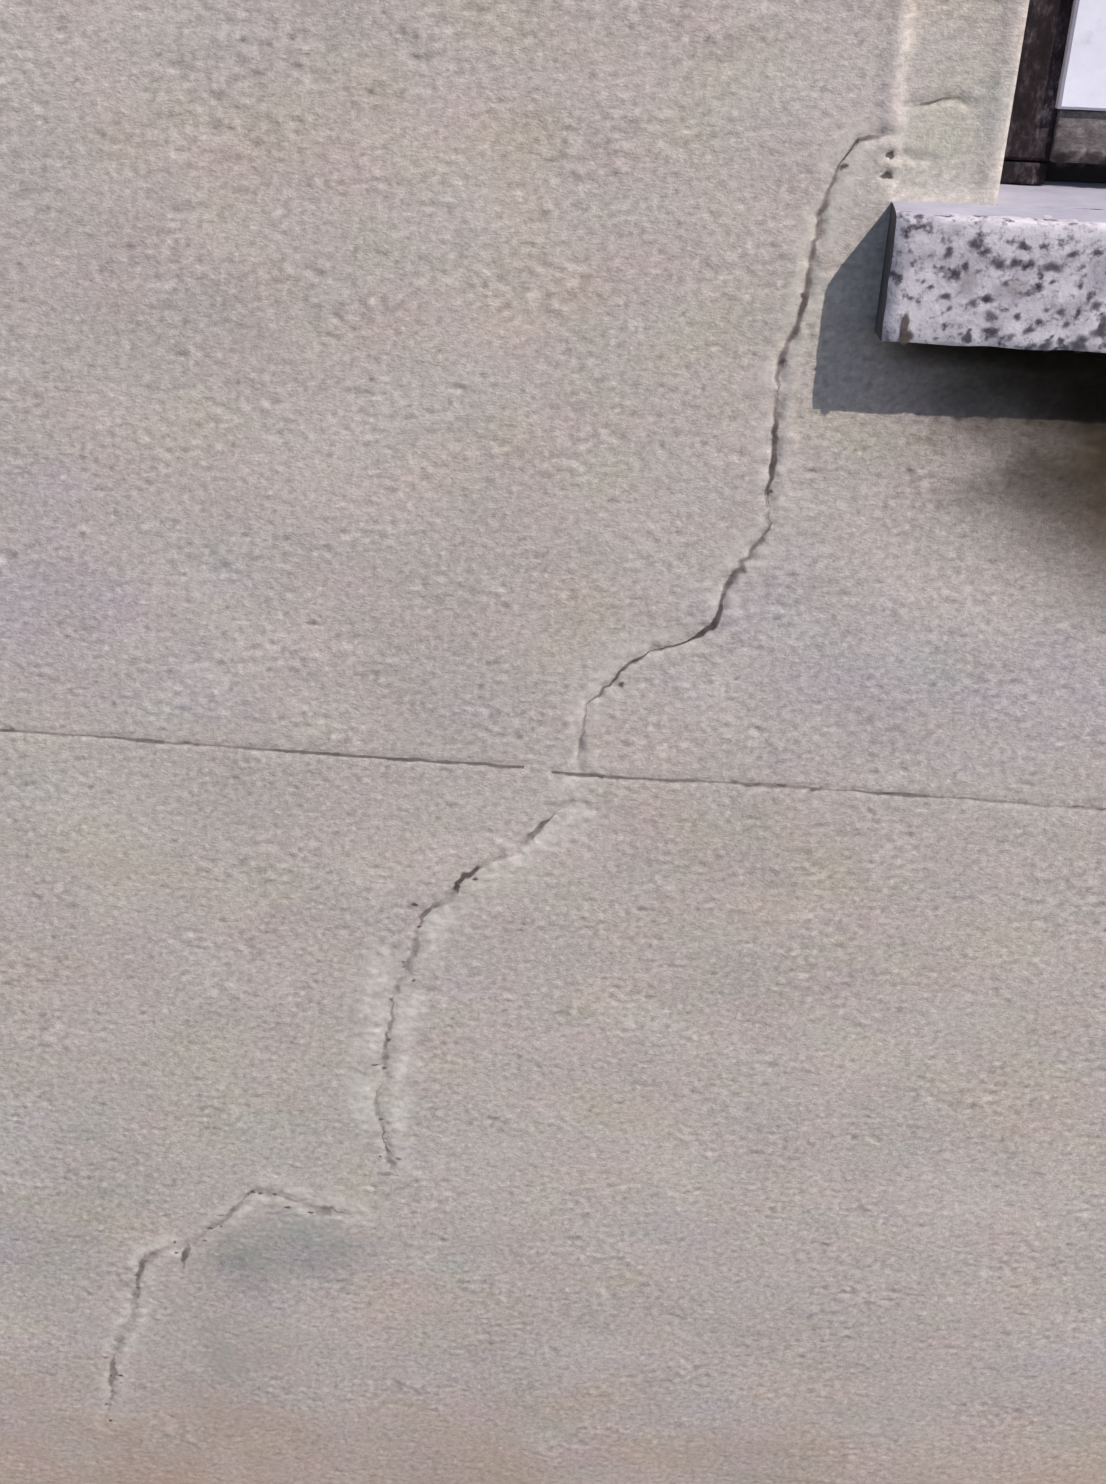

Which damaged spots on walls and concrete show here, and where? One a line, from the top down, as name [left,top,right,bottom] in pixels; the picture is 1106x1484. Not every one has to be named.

crack [834,135,875,180]
crack [767,270,811,506]
crack [584,569,739,726]
crack [80,734,199,745]
crack [253,748,697,782]
crack [734,780,929,797]
crack [454,866,480,893]
crack [135,1225,222,1288]